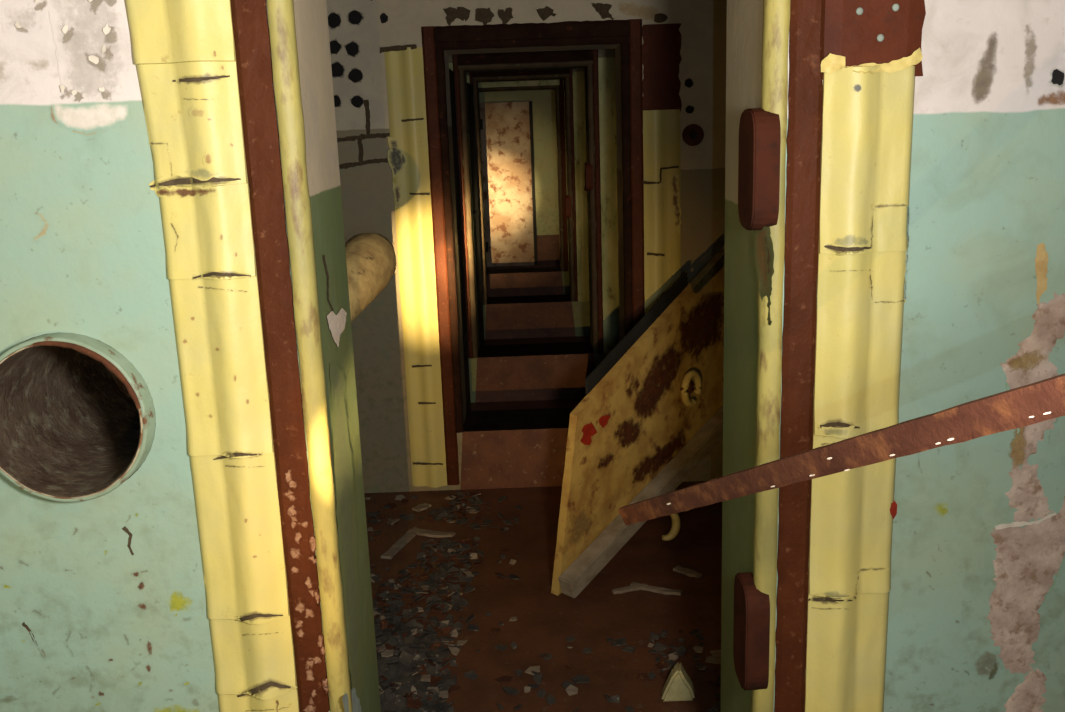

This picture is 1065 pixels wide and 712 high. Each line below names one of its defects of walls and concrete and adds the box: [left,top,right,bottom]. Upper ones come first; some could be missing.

corrosion [752,226,774,325]
peeling [1000,243,1065,390]
peeling [284,468,321,641]
peeling [987,417,1065,712]
peeling [302,633,330,712]
peeling [342,688,362,712]